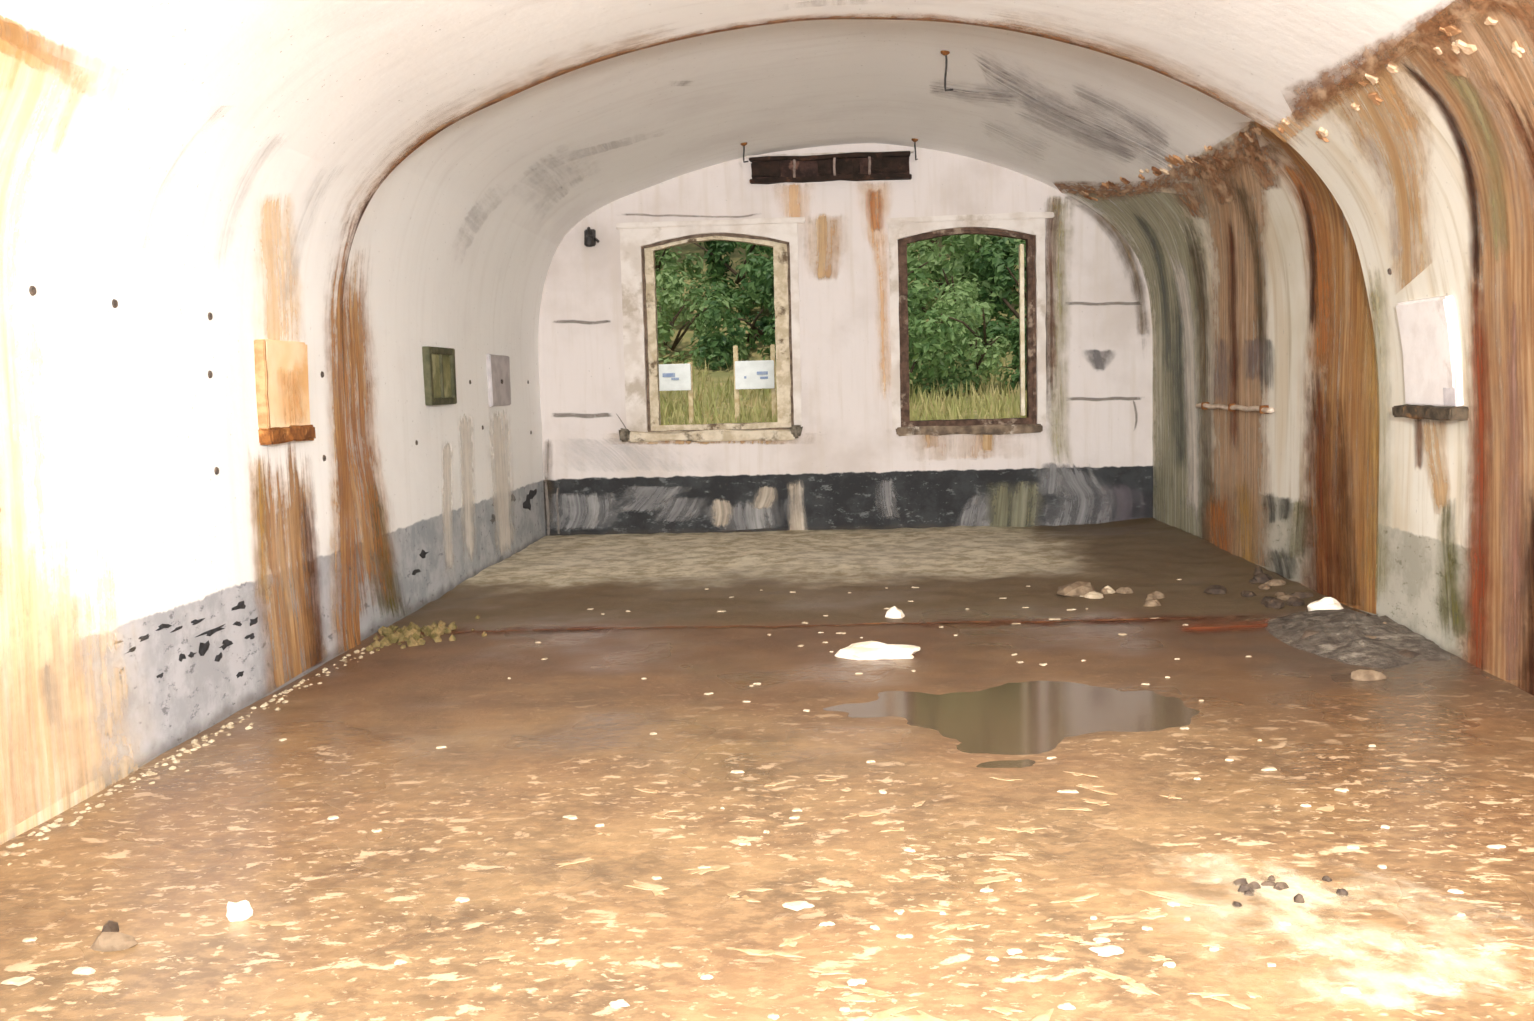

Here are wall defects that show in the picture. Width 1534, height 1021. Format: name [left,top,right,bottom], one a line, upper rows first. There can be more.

rust [869,191,881,242]
damp [1072,197,1144,334]
rust [0,16,127,845]
rust [256,195,402,688]
damp [443,415,474,567]
damp [492,414,513,555]
damp [1089,350,1110,369]
damp [1134,214,1198,514]
damp [1267,495,1303,579]
rust [1053,0,1534,696]